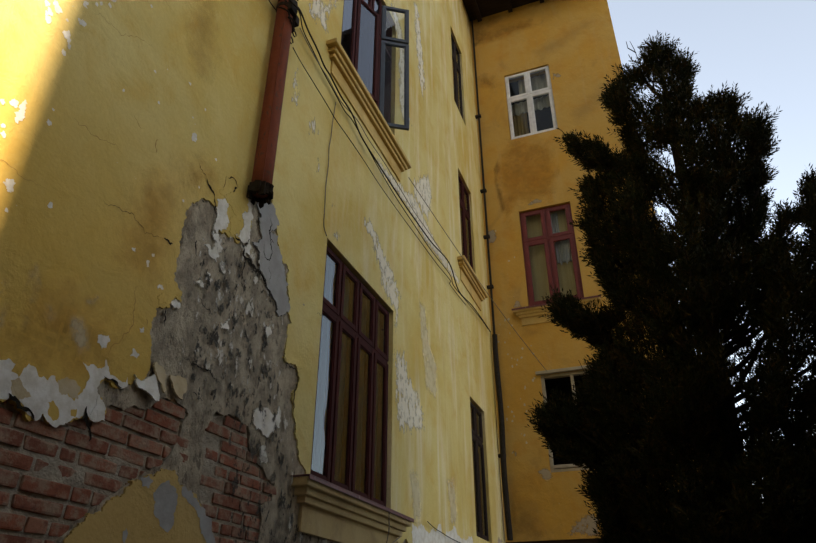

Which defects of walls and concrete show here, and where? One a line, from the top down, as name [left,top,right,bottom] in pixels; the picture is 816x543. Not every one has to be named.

peeling [45,0,87,56]
peeling [309,0,336,29]
peeling [0,98,27,124]
peeling [3,179,15,192]
crack [195,167,238,256]
crack [234,223,274,301]
peeling [364,220,401,328]
flaking render [0,189,336,543]
peeling [395,351,425,435]
peeling [403,475,473,543]